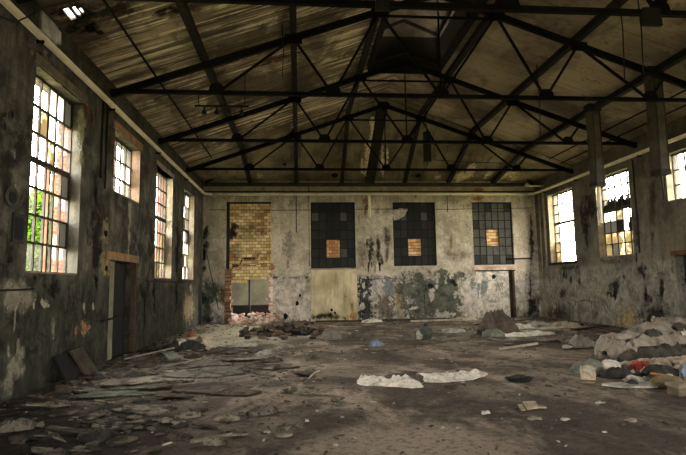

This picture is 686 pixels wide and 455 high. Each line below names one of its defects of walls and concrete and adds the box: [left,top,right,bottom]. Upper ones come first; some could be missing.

crack [229,253,269,272]
damp [366,228,390,274]
peeling [357,268,506,320]
damp [636,257,670,323]
spalling [75,302,94,338]